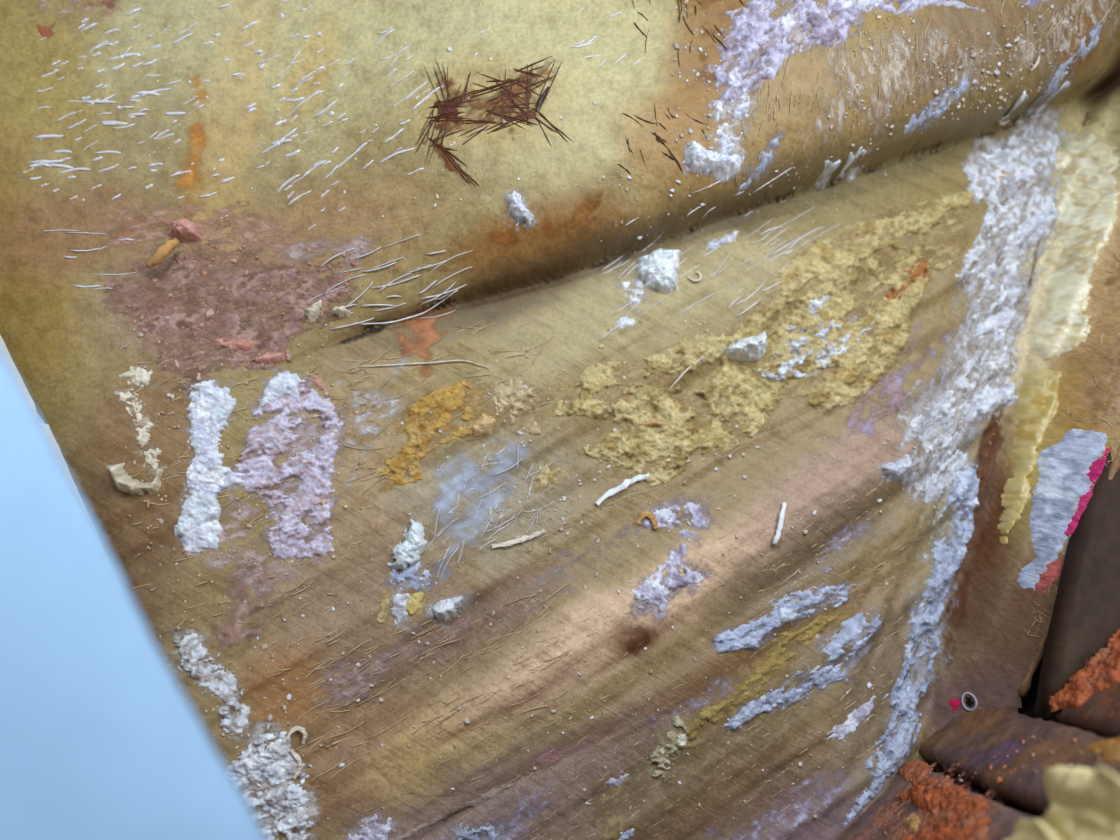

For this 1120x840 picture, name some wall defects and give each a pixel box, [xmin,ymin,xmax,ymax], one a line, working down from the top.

rust [415,55,572,185]
water stain [707,85,756,177]
water stain [966,409,1003,550]
water stain [948,584,967,641]